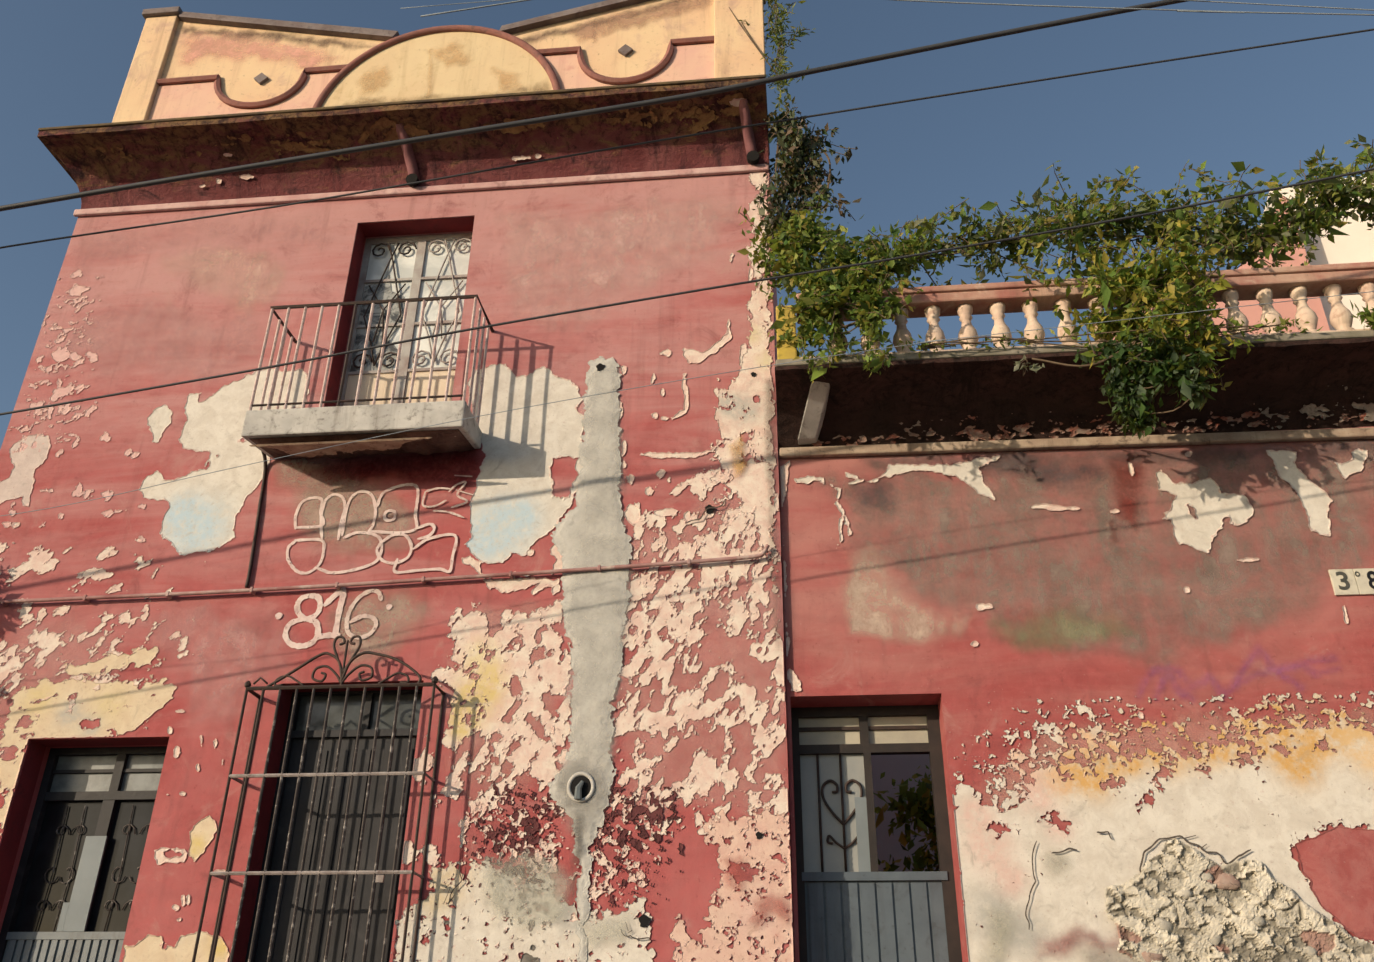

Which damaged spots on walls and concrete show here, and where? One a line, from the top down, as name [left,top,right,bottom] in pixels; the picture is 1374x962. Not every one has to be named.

peeling [0,269,432,836]
peeling [391,172,1374,962]
peeling [122,894,229,962]
peeling [154,815,217,865]
damp [468,780,684,943]